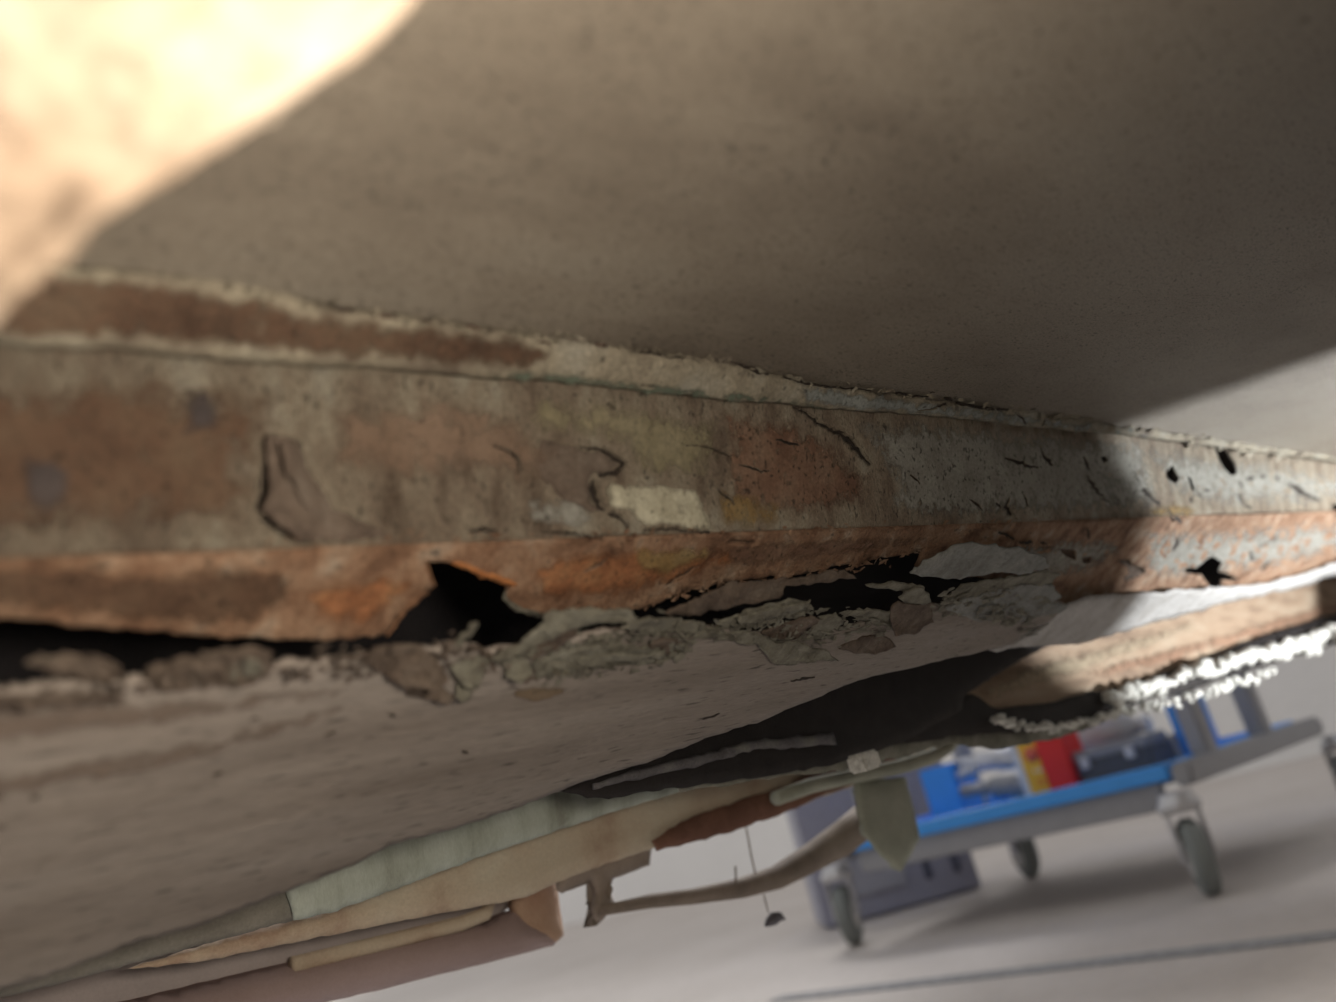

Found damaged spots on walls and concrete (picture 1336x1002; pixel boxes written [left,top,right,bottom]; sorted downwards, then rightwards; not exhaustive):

hole [1142,437,1334,475]
hole [1184,556,1233,586]
spalling [0,541,1069,714]